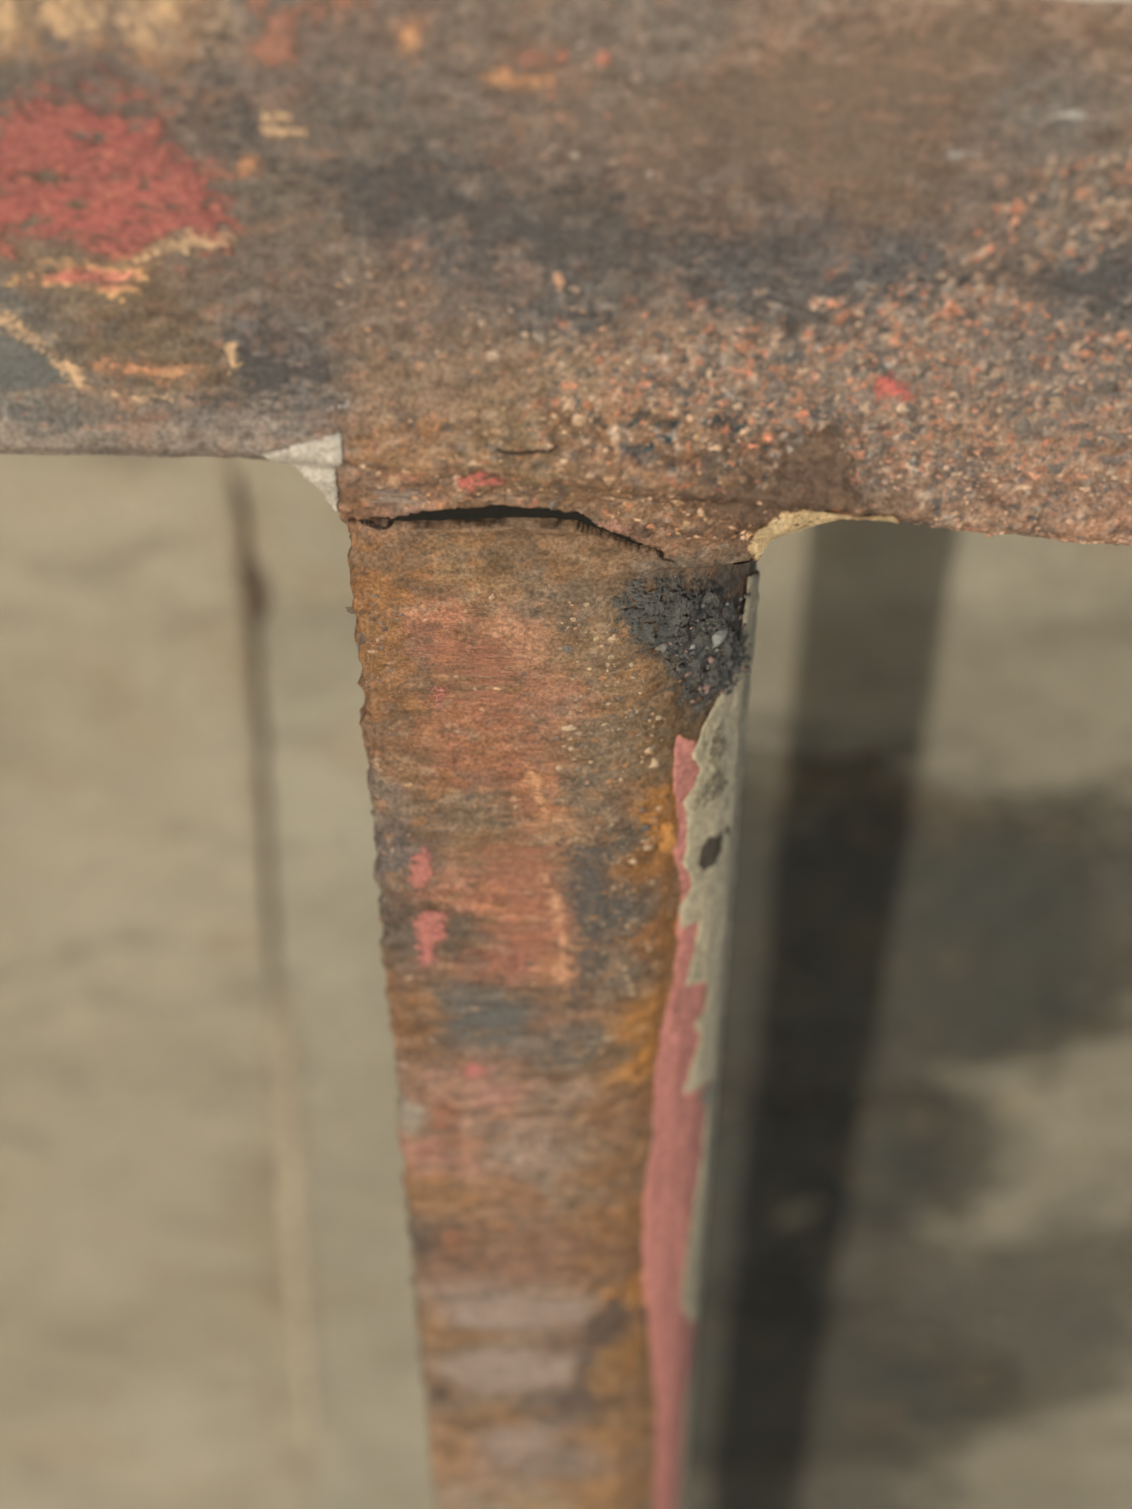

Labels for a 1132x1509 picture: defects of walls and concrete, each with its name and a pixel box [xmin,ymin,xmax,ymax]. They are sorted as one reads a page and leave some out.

crack [348,505,674,563]
crack [732,556,754,565]
rust [392,587,547,728]
rust [608,568,751,728]
rust [640,798,679,1146]
peeling [641,508,901,1509]
damp [684,742,1132,1509]